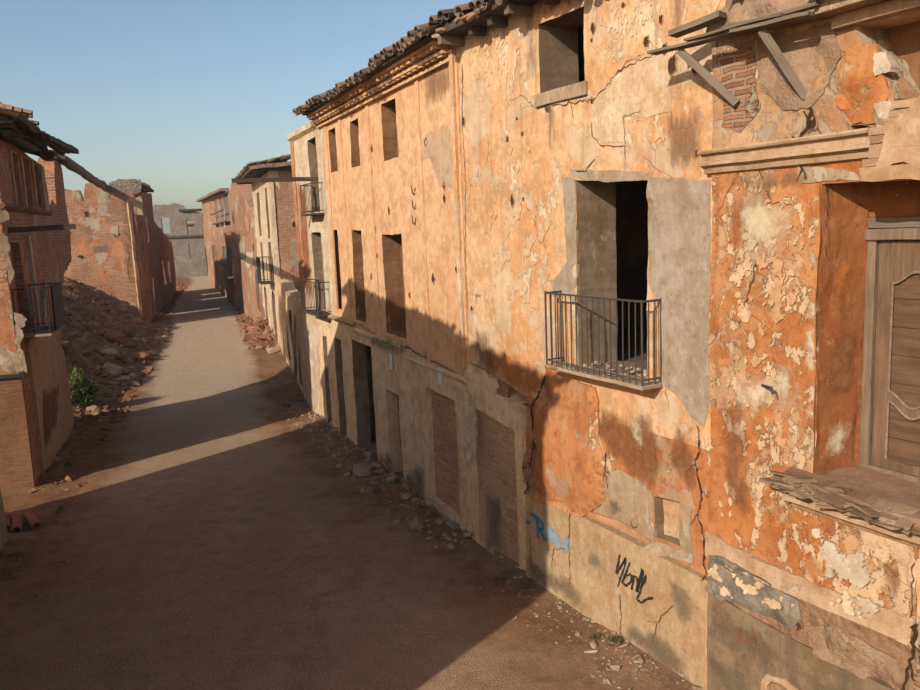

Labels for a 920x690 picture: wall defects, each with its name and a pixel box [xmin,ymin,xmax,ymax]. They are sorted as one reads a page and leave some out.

flaking render [469,0,678,150]
crack [509,55,652,176]
flaking render [717,46,761,133]
peeling [484,134,551,271]
peeling [721,213,803,337]
peeling [758,180,817,249]
crack [522,374,546,494]
crack [686,425,709,581]
peeling [718,482,740,518]
spalling [705,555,920,690]
peeling [812,528,886,619]
crack [890,563,920,690]